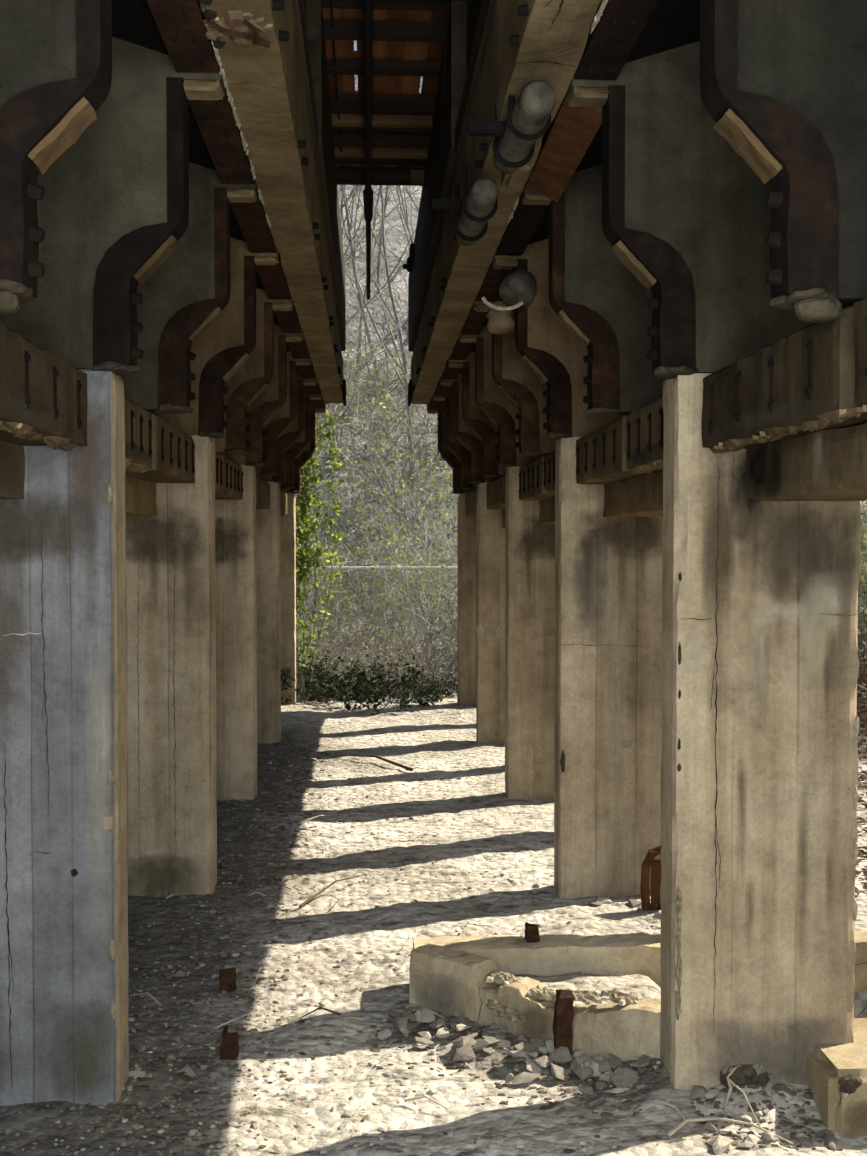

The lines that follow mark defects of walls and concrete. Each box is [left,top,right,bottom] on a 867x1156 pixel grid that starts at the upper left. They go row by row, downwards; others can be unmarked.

spalling [0,421,77,452]
water stain [0,499,70,553]
water stain [578,517,660,619]
water stain [733,446,856,611]
crack [689,465,721,1032]
crack [4,743,14,1077]
spalling [484,970,643,1006]